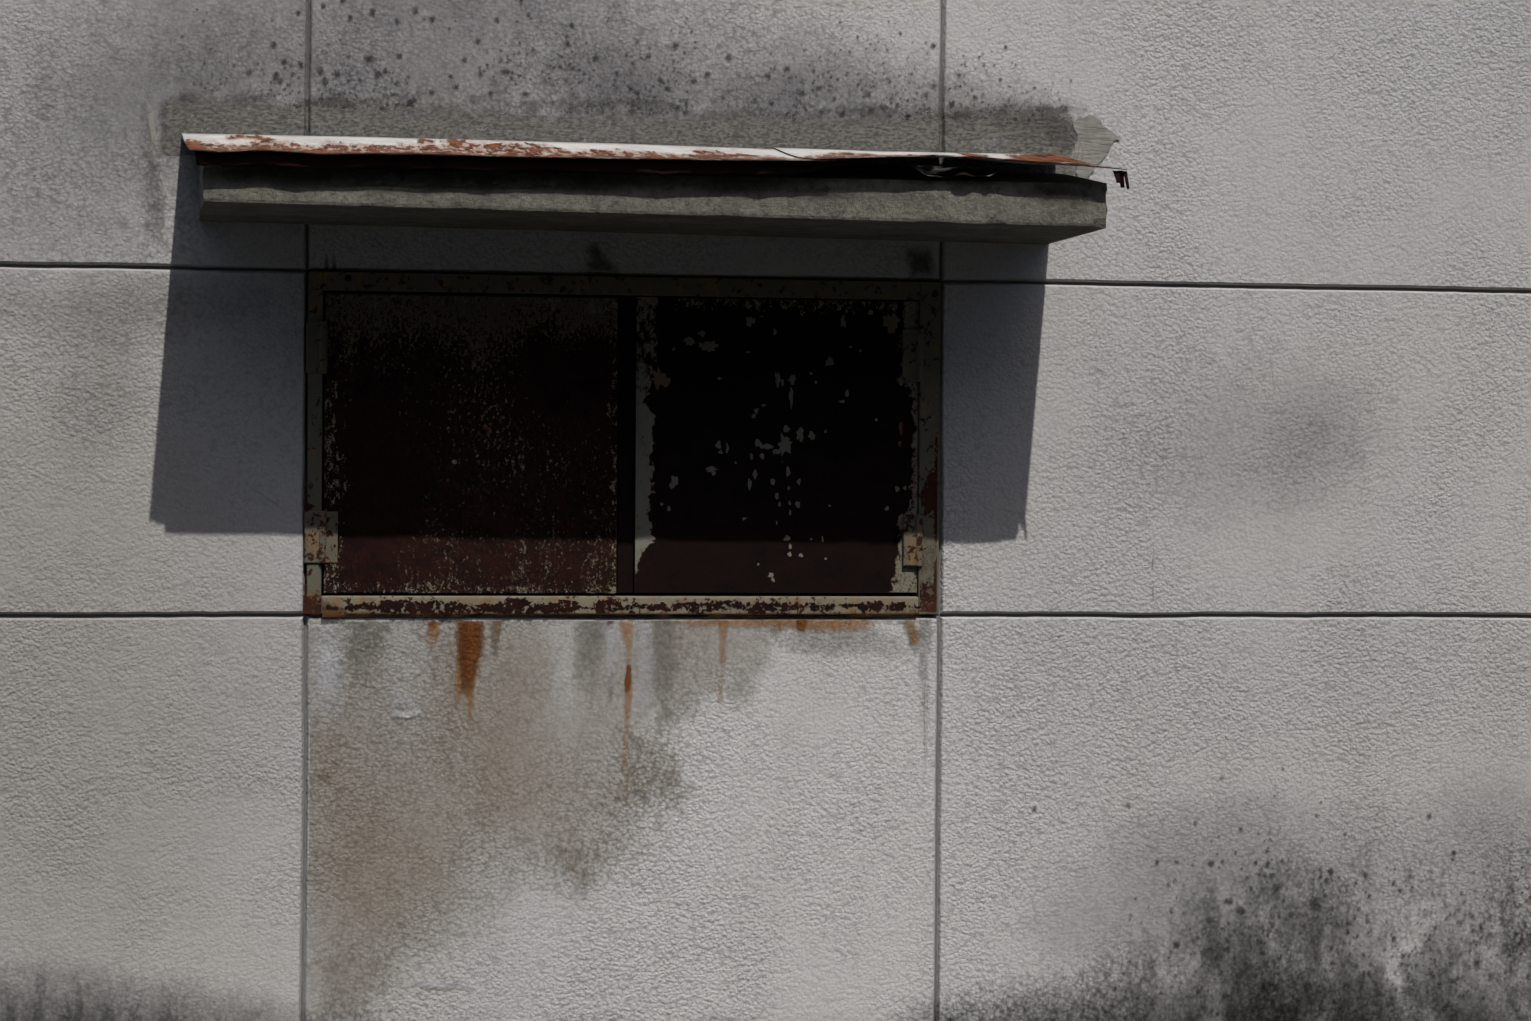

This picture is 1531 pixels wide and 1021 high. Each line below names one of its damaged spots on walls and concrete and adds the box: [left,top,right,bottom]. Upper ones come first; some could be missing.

leakage [131,0,1062,124]
corrosion [185,134,1121,168]
corrosion [457,621,501,701]
leakage [307,634,576,941]
leakage [946,828,1531,1021]